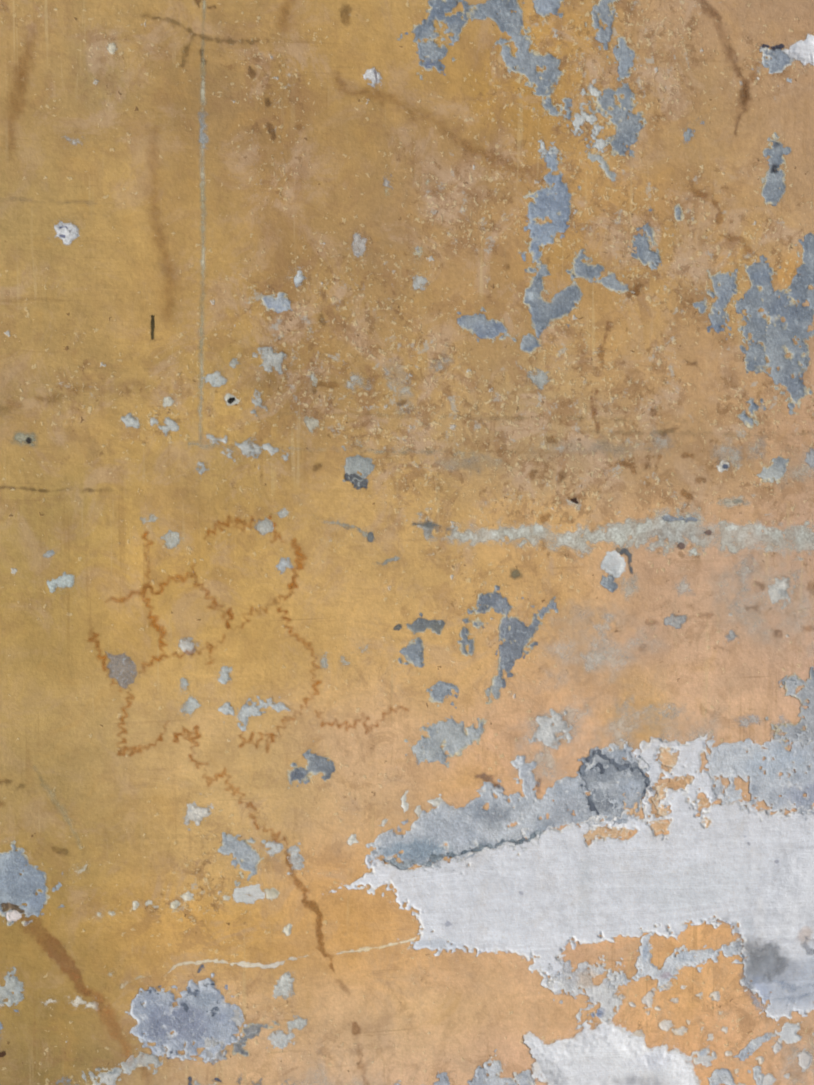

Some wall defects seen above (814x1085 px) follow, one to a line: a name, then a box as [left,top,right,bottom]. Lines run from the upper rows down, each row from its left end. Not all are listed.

peeling [397,0,648,181]
peeling [751,33,814,83]
peeling [759,132,791,207]
peeling [454,137,663,391]
peeling [688,232,814,428]
peeling [303,413,322,435]
peeling [393,585,560,705]
peeling [0,840,91,926]
flaking render [321,661,814,1085]
peeling [39,992,100,1013]
flaking render [55,964,310,1085]
crack [119,953,309,989]